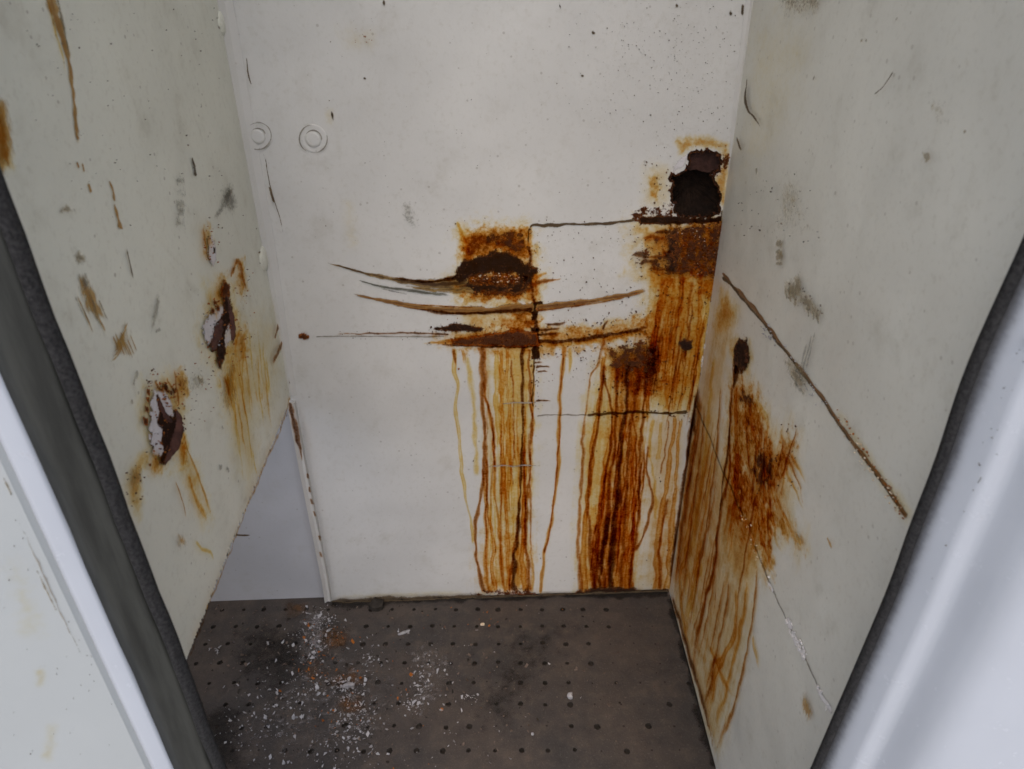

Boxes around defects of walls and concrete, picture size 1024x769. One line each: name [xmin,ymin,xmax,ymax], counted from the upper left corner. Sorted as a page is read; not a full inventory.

corrosion [0,100,12,172]
spalling [671,163,721,217]
corrosion [126,259,255,507]
corrosion [402,145,801,729]